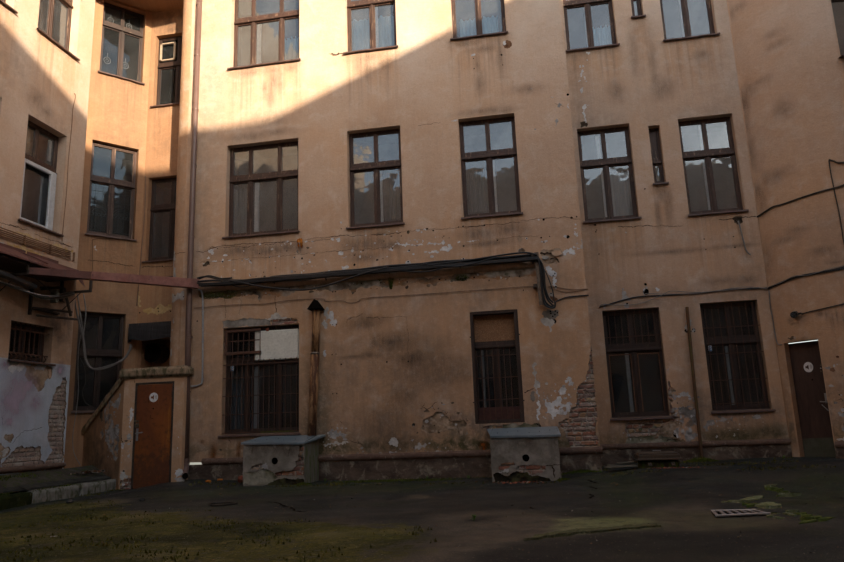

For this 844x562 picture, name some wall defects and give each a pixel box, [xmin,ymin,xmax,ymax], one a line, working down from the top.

flaking render [198,216,583,332]
flaking render [8,363,52,392]
flaking render [0,377,67,473]
flaking render [100,394,134,490]
spalling [379,402,468,453]
spalling [493,462,560,482]
flaking render [480,347,599,447]
flaking render [623,369,766,443]